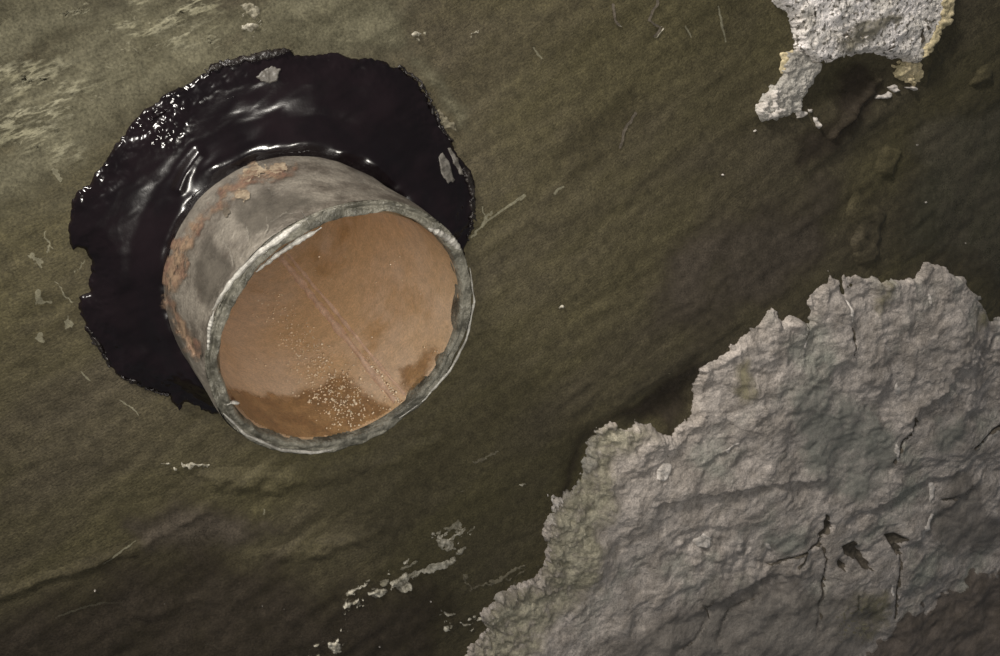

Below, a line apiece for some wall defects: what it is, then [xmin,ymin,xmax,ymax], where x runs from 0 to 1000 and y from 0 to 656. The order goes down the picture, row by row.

spalling [753,0,956,132]
corrosion [162,162,297,358]
spalling [440,262,1000,656]
crack [893,418,919,464]
crack [767,534,828,625]
crack [895,551,903,619]